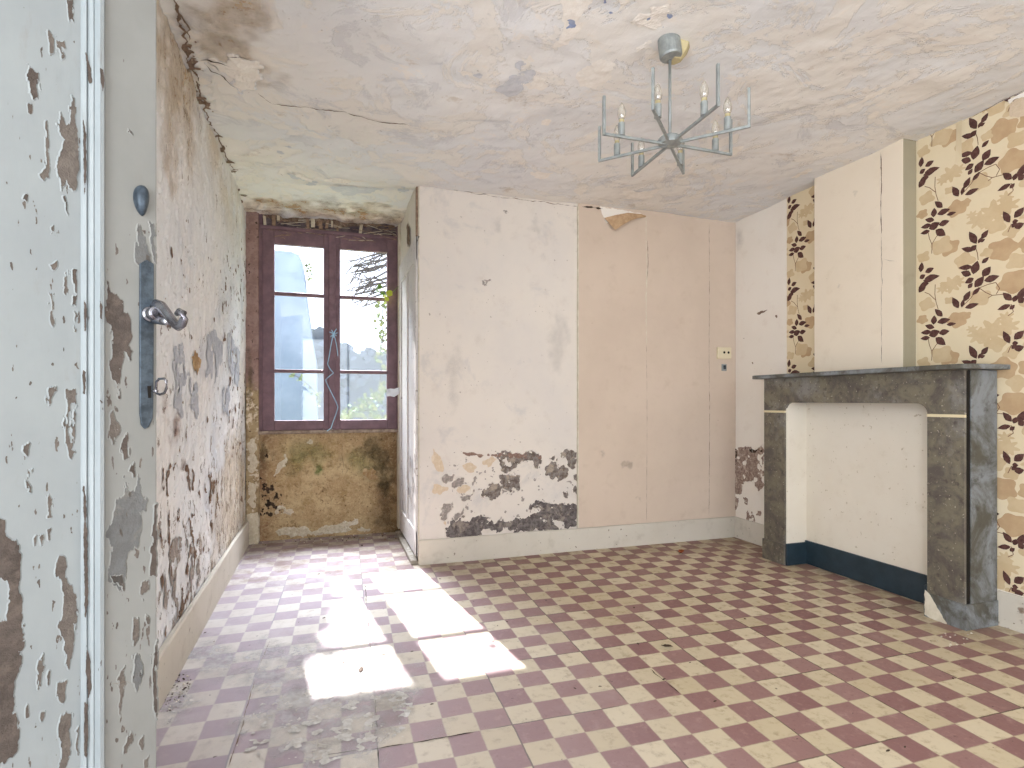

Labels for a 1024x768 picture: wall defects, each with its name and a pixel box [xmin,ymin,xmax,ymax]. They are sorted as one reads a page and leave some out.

peeling [40,29,75,61]
peeling [85,52,105,91]
peeling [181,41,265,112]
crack [174,0,407,173]
peeling [25,63,87,216]
spalling [263,214,410,245]
peeling [36,260,87,333]
peeling [44,363,86,461]
peeling [100,248,380,768]
spalling [431,448,577,538]
spalling [735,445,764,522]
peeling [0,434,92,768]